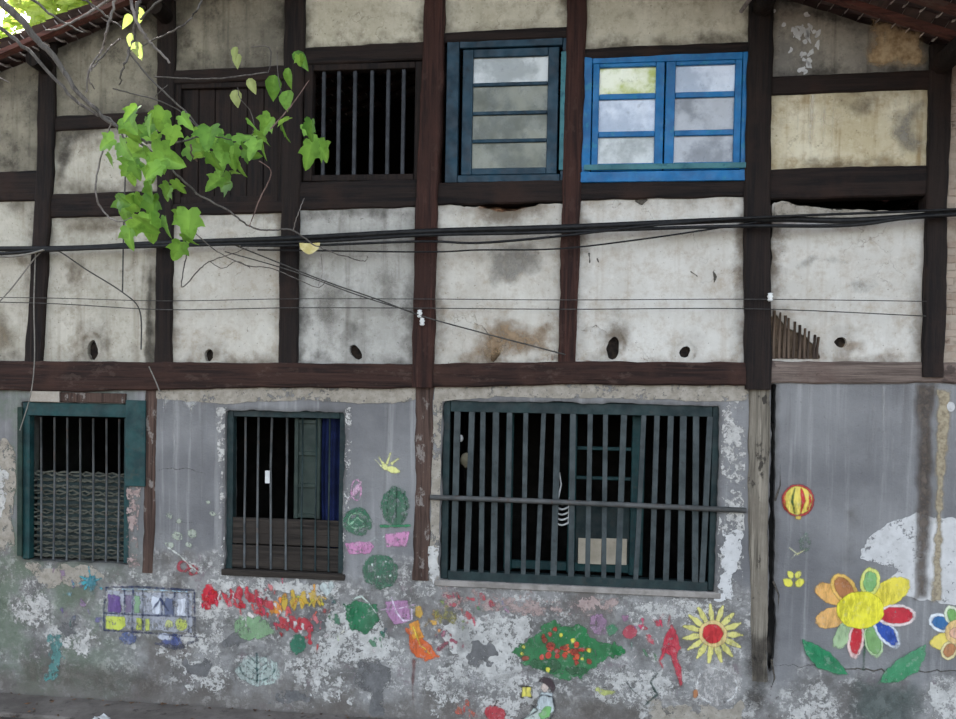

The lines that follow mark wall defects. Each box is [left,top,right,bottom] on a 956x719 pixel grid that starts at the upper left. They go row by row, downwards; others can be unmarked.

flaking render [774,202,920,218]
peeling [0,438,16,550]
leakage [916,386,950,601]
peeling [12,562,104,659]
peeling [424,545,619,719]
peeling [860,512,956,605]